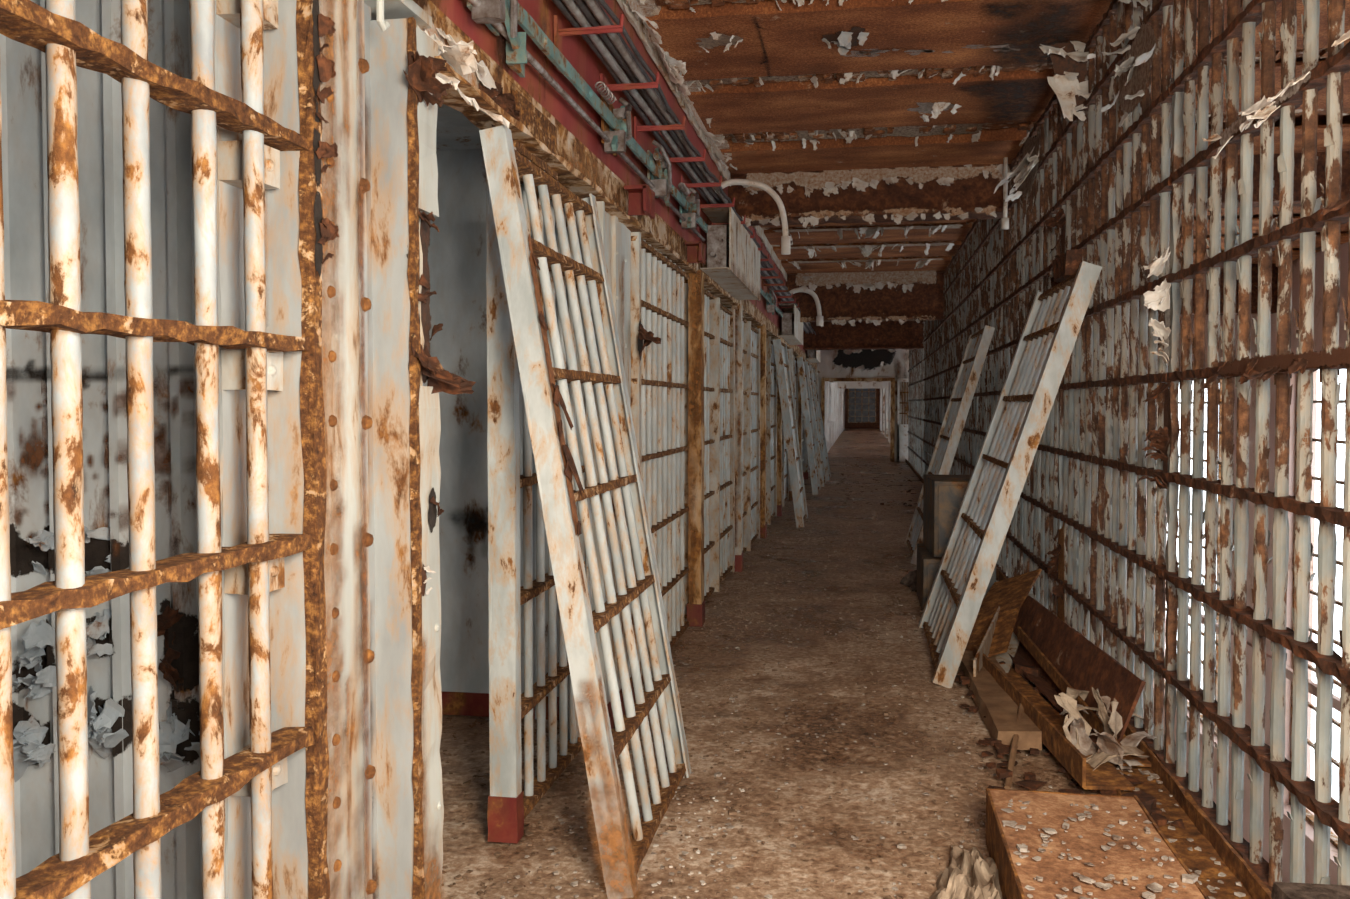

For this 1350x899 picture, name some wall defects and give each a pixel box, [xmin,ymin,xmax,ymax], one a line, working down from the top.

peeling [403,23,520,129]
peeling [1039,0,1157,128]
rust [320,0,367,403]
peeling [624,0,1040,293]
peeling [10,523,55,578]
peeling [84,526,129,576]
rust [325,443,367,672]
peeling [87,685,132,759]
peeling [157,599,200,773]
rust [326,606,377,899]
rust [580,678,606,714]
rust [594,784,638,896]